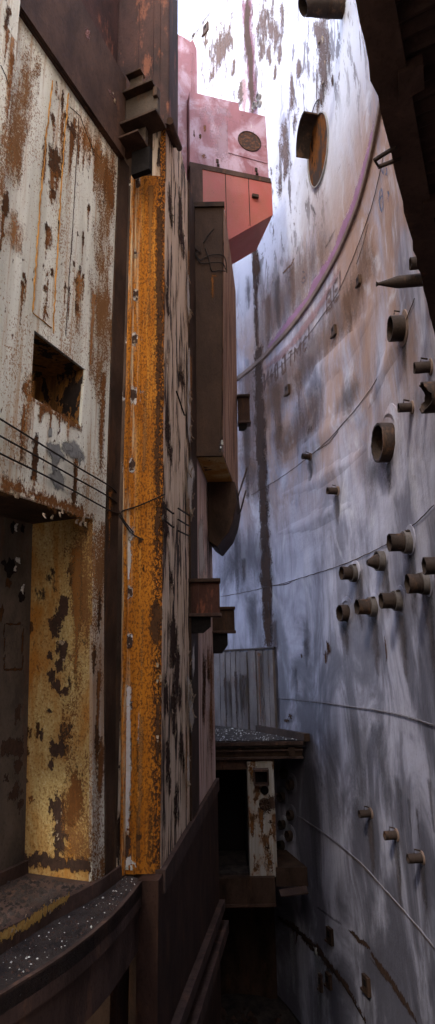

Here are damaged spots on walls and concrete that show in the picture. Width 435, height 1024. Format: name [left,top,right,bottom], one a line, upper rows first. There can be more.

rust [0,0,42,252]
peeling [204,12,244,107]
peeling [255,0,333,201]
rust [19,272,27,325]
rust [42,81,118,473]
rust [138,185,168,556]
damp [224,249,369,724]
rust [0,374,113,883]
rust [129,663,162,863]
rust [140,597,163,680]